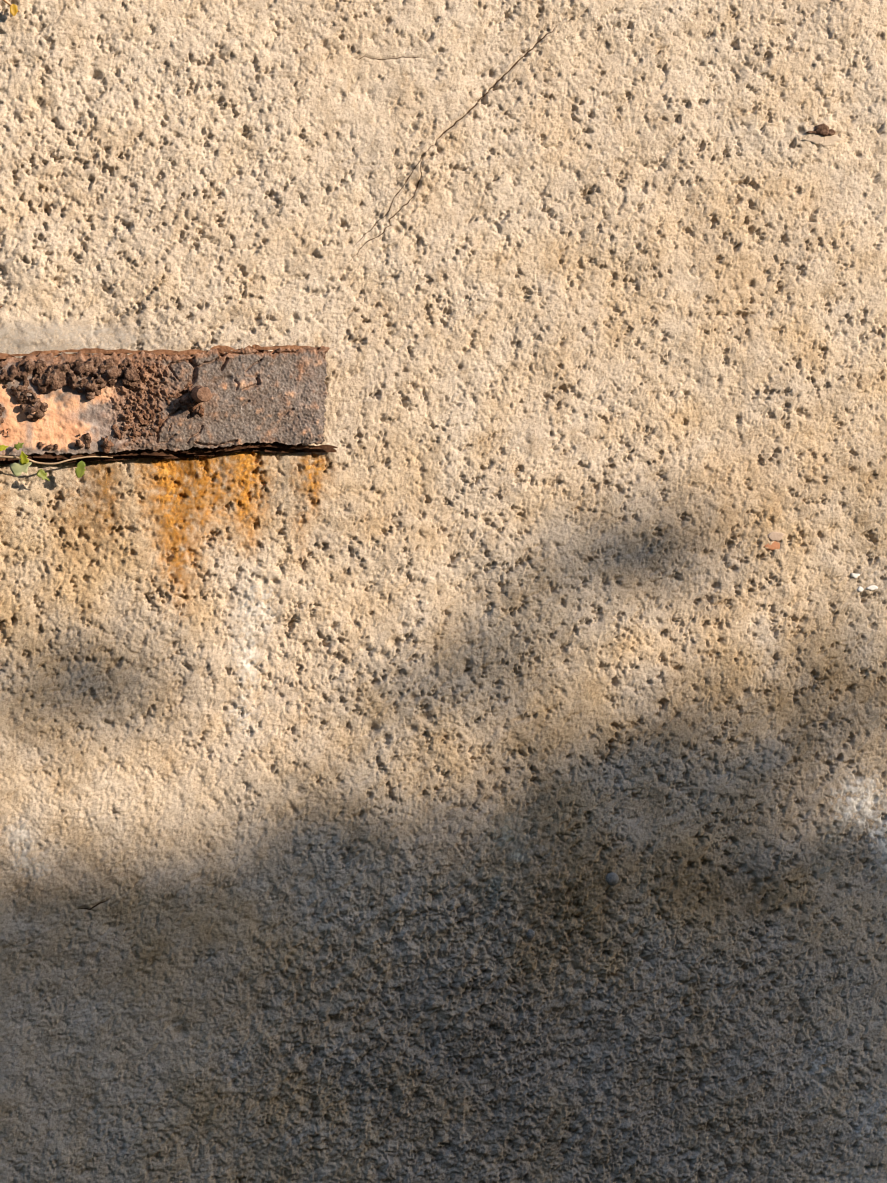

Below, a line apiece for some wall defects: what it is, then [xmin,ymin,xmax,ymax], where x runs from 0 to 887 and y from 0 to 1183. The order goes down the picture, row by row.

corrosion [0,344,337,566]